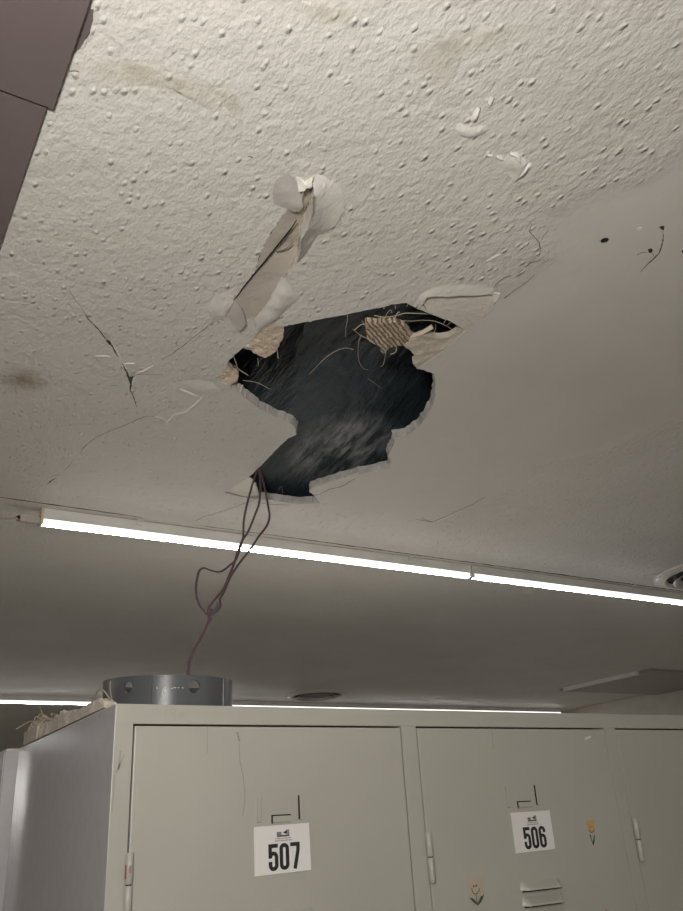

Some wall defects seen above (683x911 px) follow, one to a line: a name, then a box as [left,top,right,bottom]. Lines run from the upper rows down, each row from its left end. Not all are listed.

peeling [208,173,345,331]
crack [486,227,549,298]
crack [1,292,219,518]
spalling [218,374,436,504]
crack [196,492,680,591]